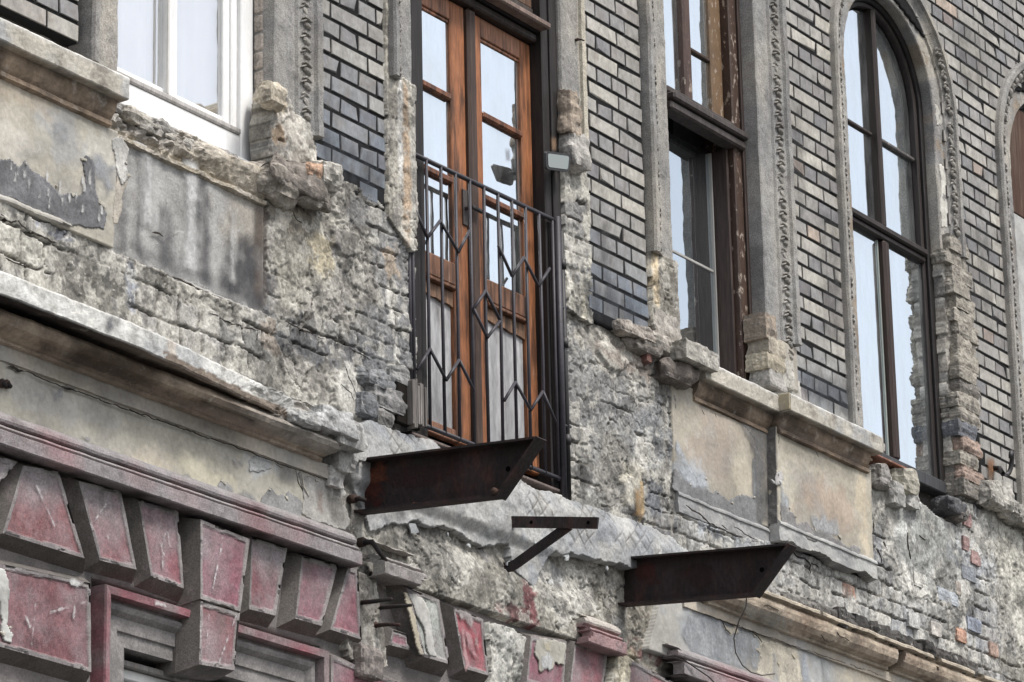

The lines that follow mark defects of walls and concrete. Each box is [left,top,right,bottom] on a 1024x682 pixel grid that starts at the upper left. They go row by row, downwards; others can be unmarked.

damp [138,154,264,311]
spalling [0,0,673,682]
spalling [557,89,1024,682]